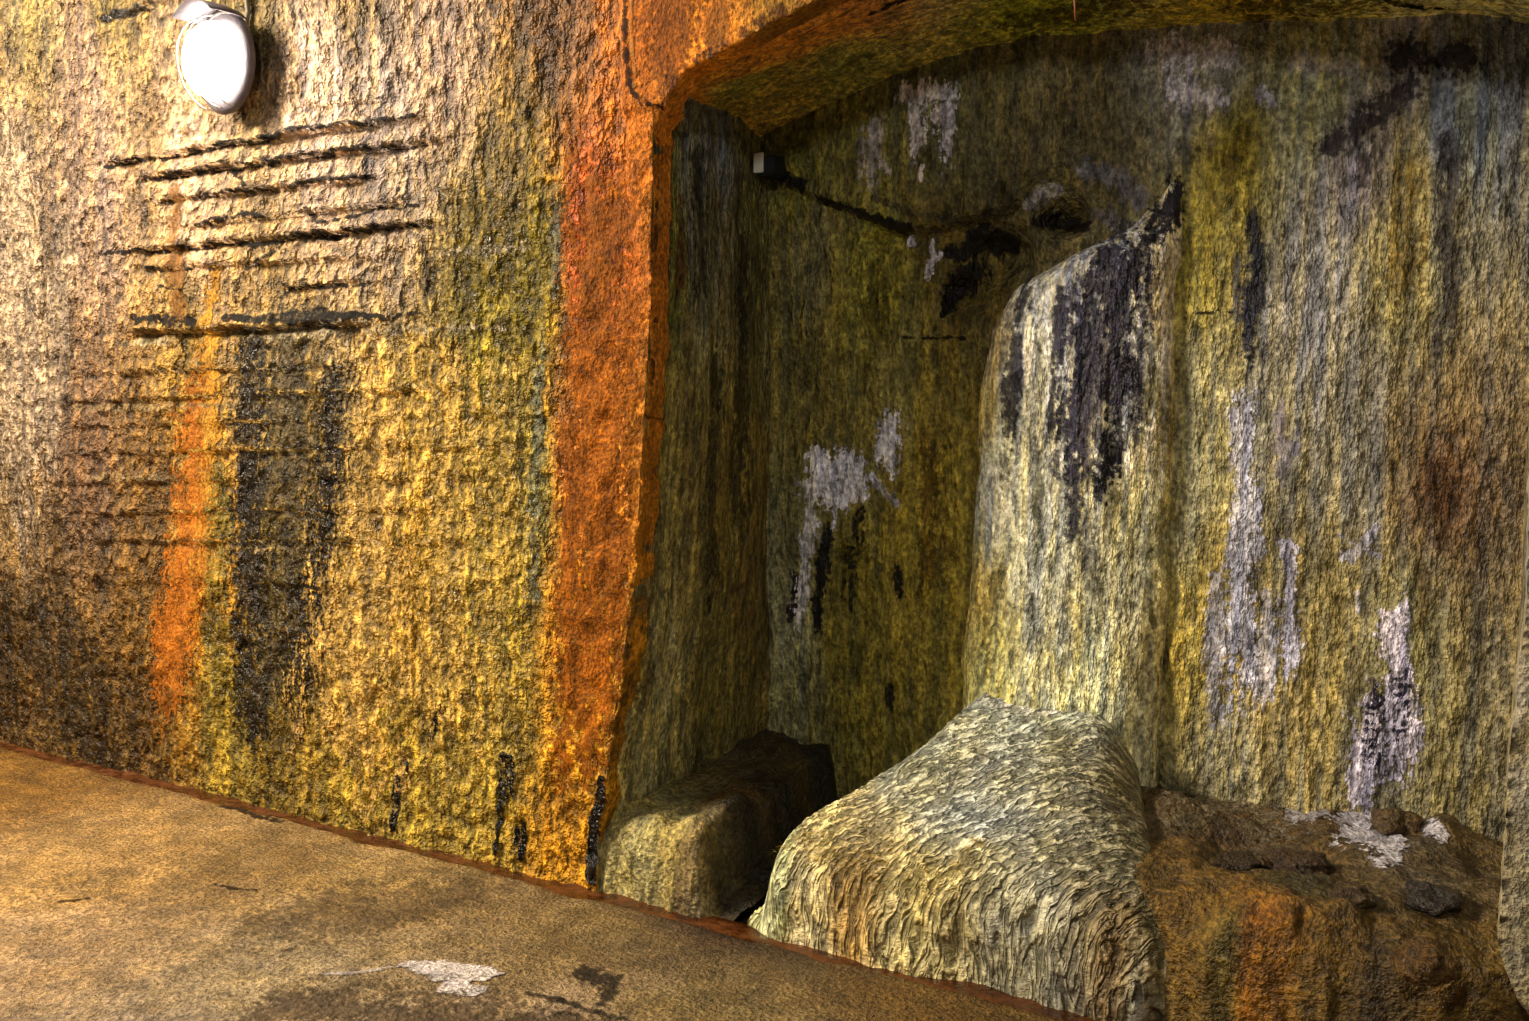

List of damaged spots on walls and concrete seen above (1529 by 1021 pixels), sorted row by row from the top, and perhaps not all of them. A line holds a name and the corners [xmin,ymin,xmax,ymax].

crack [98,113,434,329]
corrosion [638,0,742,97]
damp [856,75,960,195]
corrosion [146,183,225,751]
damp [0,111,549,838]
corrosion [549,114,687,809]
damp [786,407,956,635]
damp [1001,273,1033,451]
damp [1046,173,1186,643]
damp [1135,28,1306,730]
damp [1329,589,1450,870]
damp [225,966,638,1021]